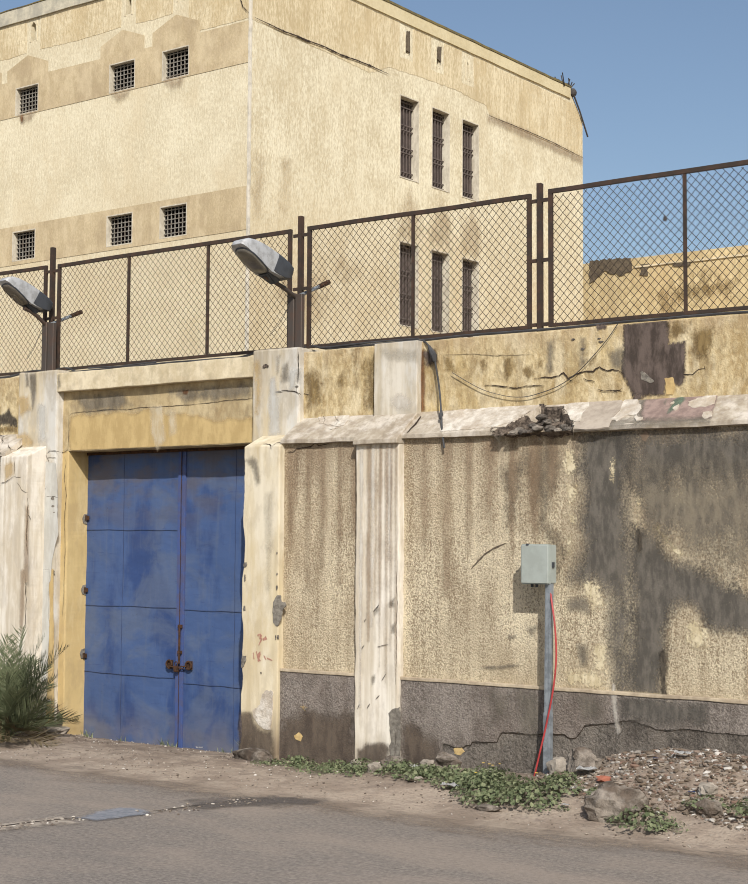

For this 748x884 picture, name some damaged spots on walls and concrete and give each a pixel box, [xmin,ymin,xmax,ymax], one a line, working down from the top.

crack [241,1,388,74]
damp [0,374,45,445]
peeling [440,402,590,439]
crack [485,366,624,392]
peeling [610,399,643,421]
peeling [640,371,717,419]
crack [0,398,251,555]
damp [505,271,748,728]
flaking render [272,573,287,640]
peeling [253,690,273,730]
crack [447,721,707,749]